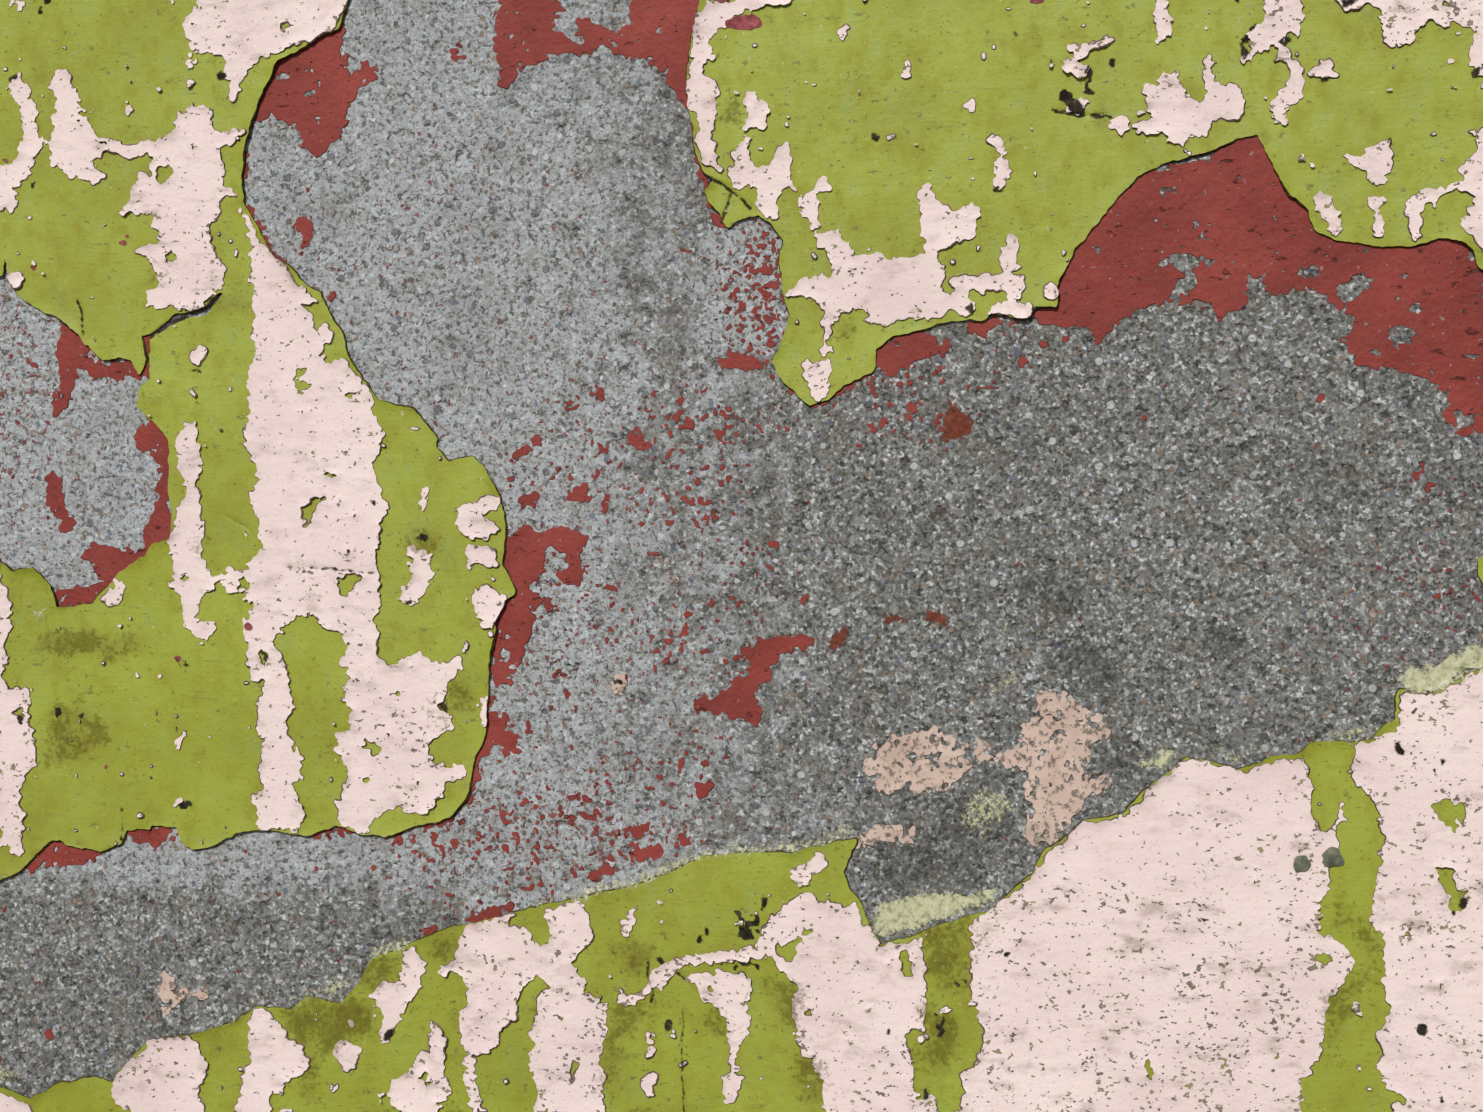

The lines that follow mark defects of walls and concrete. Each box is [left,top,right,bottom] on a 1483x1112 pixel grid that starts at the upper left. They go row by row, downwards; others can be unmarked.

peeling [0,0,323,607]
peeling [772,289,1008,407]
peeling [685,0,1483,358]
peeling [0,540,264,880]
peeling [269,614,352,836]
peeling [360,392,517,838]
peeling [111,1005,264,1112]
peeling [234,924,472,1112]
peeling [474,975,550,1112]
peeling [571,837,873,1112]
peeling [888,912,986,1112]
peeling [1239,741,1406,1112]